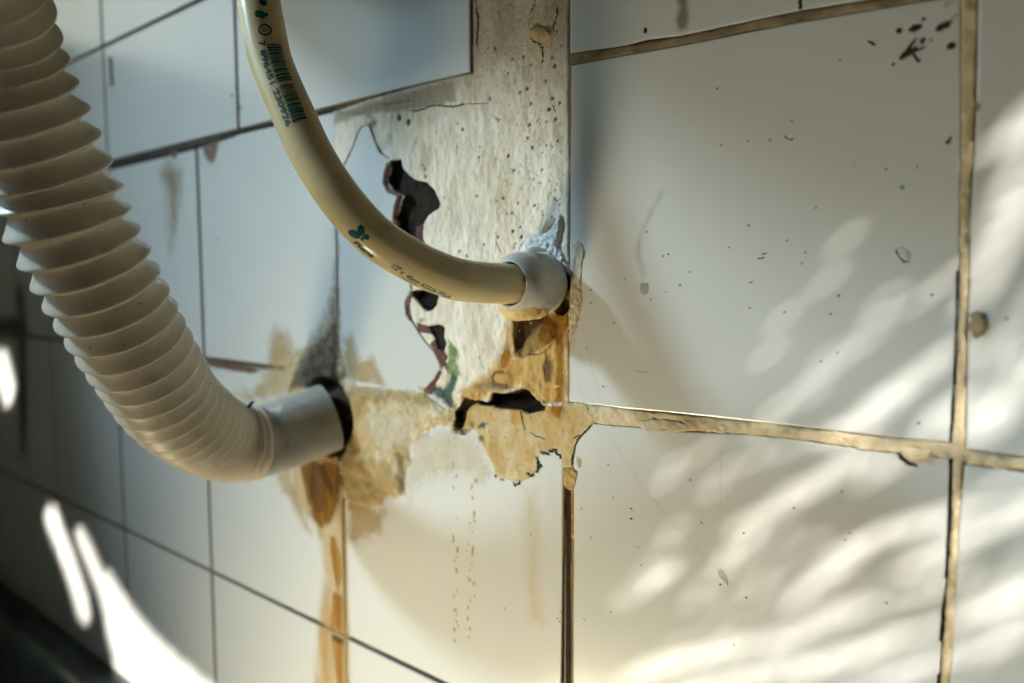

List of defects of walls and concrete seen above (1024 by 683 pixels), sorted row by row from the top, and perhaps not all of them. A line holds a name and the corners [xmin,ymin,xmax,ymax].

crack [384,101,486,112]
flaking render [334,0,572,328]
water stain [207,360,258,373]
water stain [256,264,381,444]
spalling [286,285,596,509]
corrosion [455,309,573,418]
corrosion [295,460,349,683]